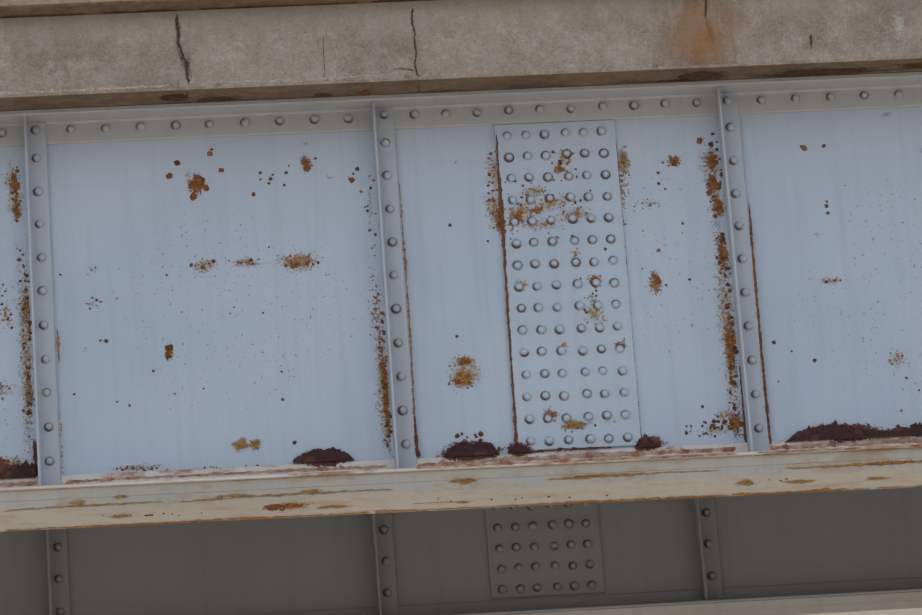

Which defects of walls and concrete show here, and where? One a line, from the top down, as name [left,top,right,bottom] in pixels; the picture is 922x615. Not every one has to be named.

crack [175,14,192,98]
crack [395,9,420,91]
rust [4,163,23,223]
rust [186,173,209,201]
rust [300,155,317,172]
rust [0,248,38,487]
rust [152,333,184,372]
rust [162,238,347,291]
rust [360,274,393,452]
rust [398,133,747,469]
rust [749,205,922,453]
rust [60,423,387,484]